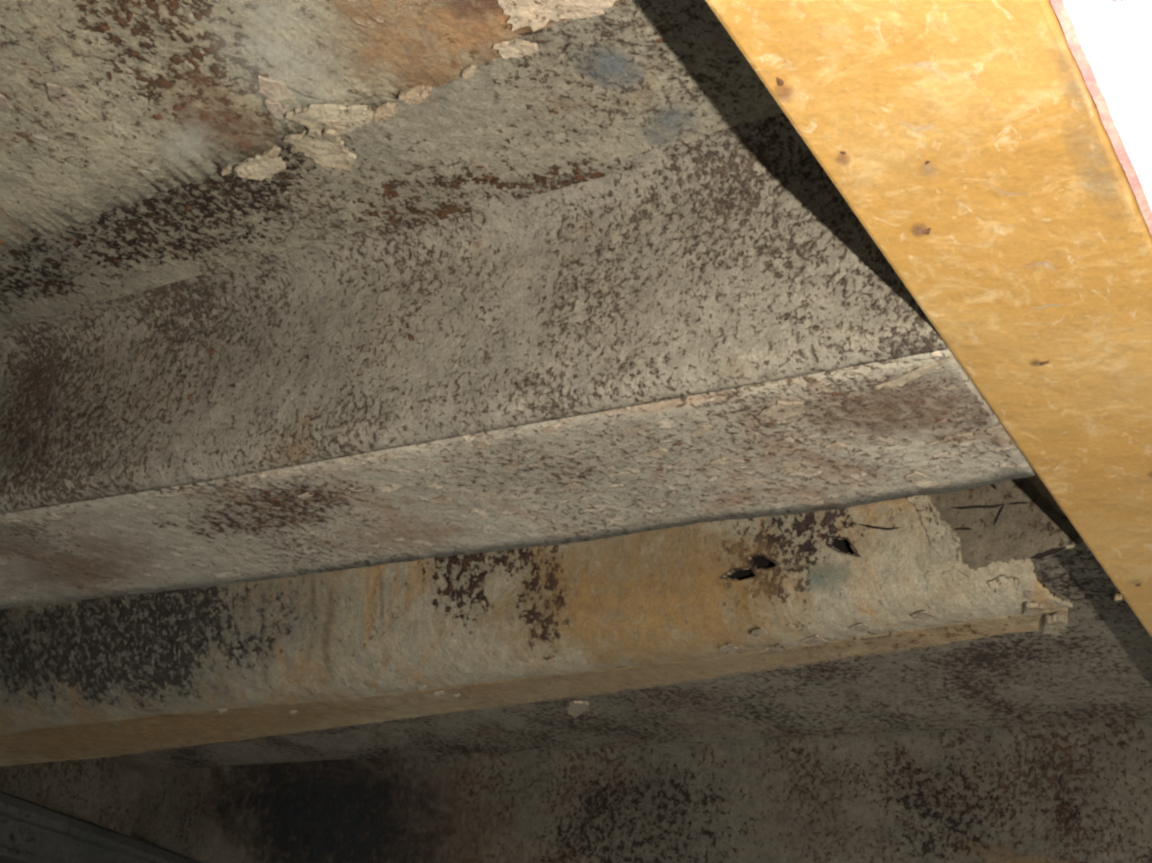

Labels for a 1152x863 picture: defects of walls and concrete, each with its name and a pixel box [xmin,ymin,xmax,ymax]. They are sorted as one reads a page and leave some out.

rust [66,0,296,157]
peeling [221,75,432,181]
rust [0,30,667,318]
rust [359,0,513,72]
peeling [493,0,616,59]
damp [0,586,280,707]
rust [418,544,572,661]
rust [713,509,865,626]
spalling [905,472,1084,571]
peeling [1023,602,1066,635]
damp [219,758,431,863]